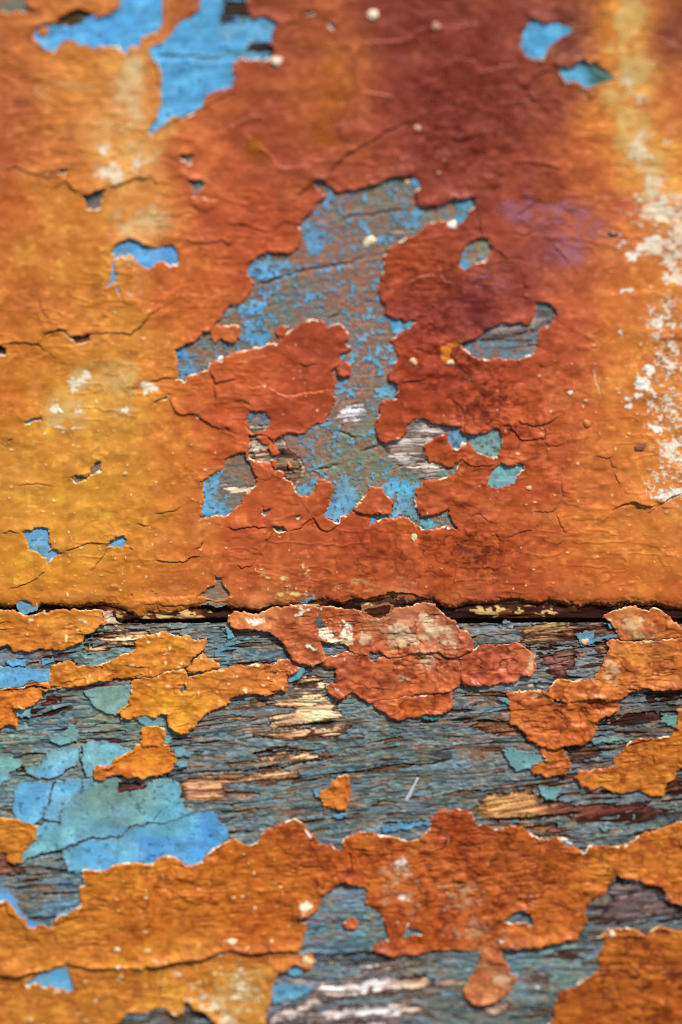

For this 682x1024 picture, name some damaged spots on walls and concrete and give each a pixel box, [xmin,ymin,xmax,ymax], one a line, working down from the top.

peeling [34,0,278,134]
peeling [520,18,573,59]
peeling [106,239,178,294]
crack [2,298,48,352]
peeling [175,176,524,531]
peeling [440,302,557,364]
crack [502,417,562,451]
crack [471,479,565,547]
peeling [23,527,61,563]
peeling [0,576,682,928]
peeling [265,875,682,1024]
peeling [119,1003,215,1024]